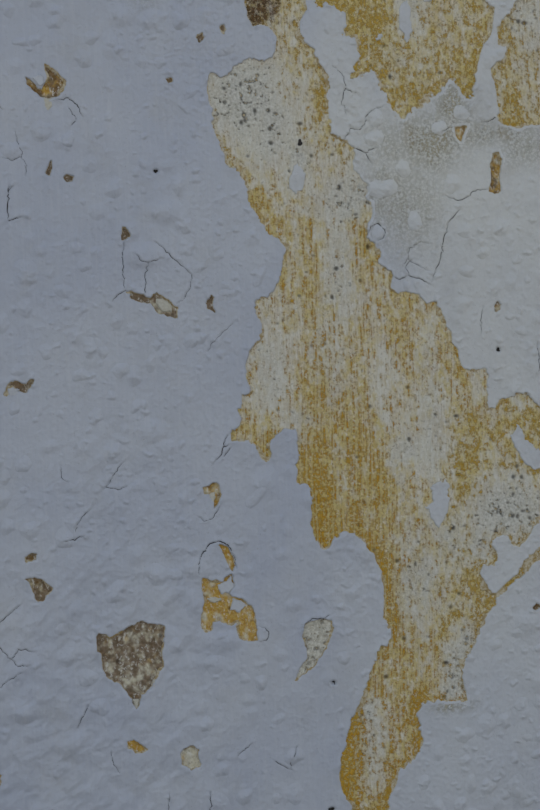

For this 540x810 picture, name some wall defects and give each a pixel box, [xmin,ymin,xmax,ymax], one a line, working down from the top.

peeling [26,67,63,110]
crack [395,189,486,282]
crack [113,244,191,300]
peeling [131,293,177,318]
peeling [7,380,33,396]
peeling [201,0,540,810]
peeling [26,578,52,601]
spalling [97,621,164,708]